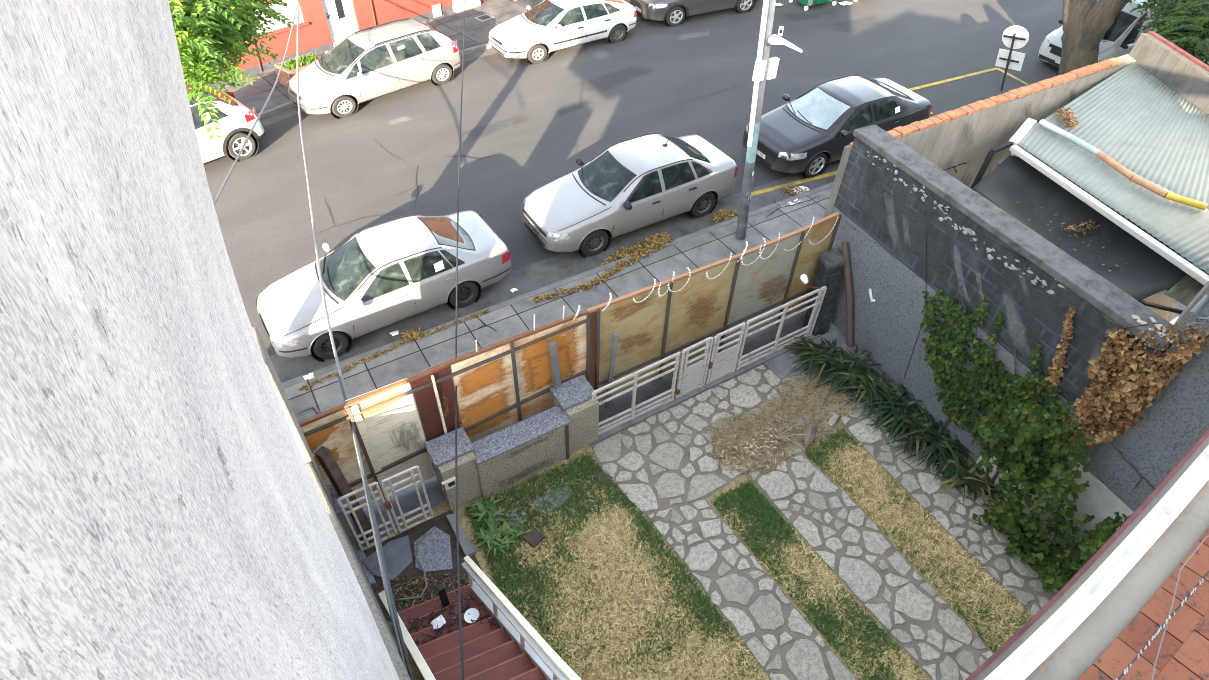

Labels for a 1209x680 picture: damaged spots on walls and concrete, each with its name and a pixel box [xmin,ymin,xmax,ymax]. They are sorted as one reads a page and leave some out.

rust [521,322,577,392]
rust [458,358,510,436]